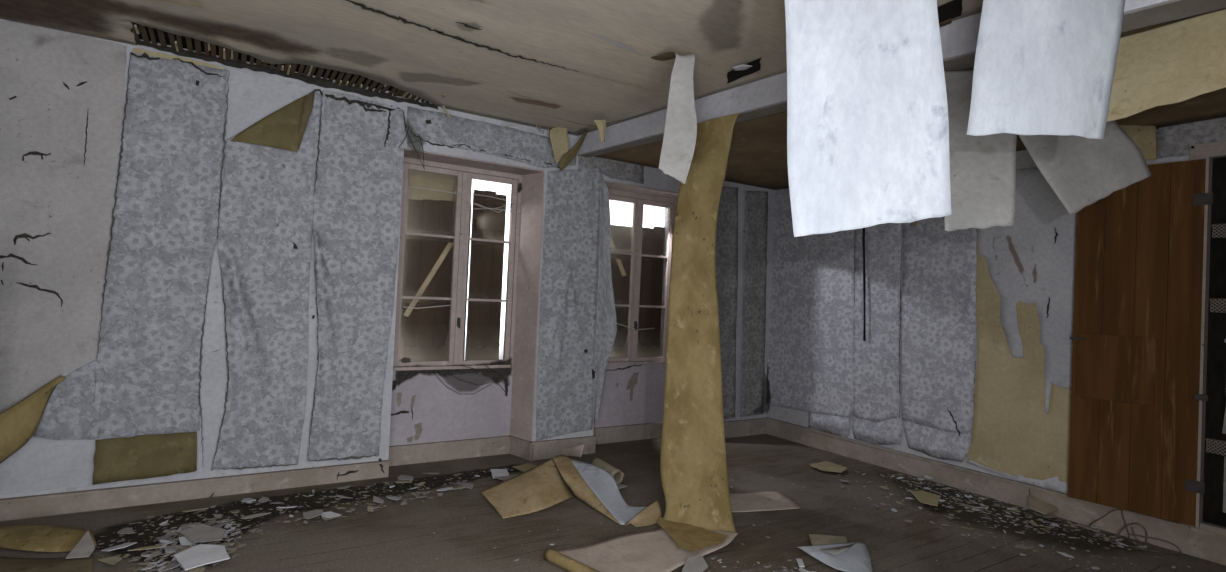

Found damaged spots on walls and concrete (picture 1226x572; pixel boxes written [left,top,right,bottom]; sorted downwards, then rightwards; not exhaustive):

crack [82,112,90,166]
crack [346,0,659,142]
crack [1124,8,1226,33]
crack [0,254,36,285]
peeling [0,21,439,495]
flaking render [966,228,1071,483]